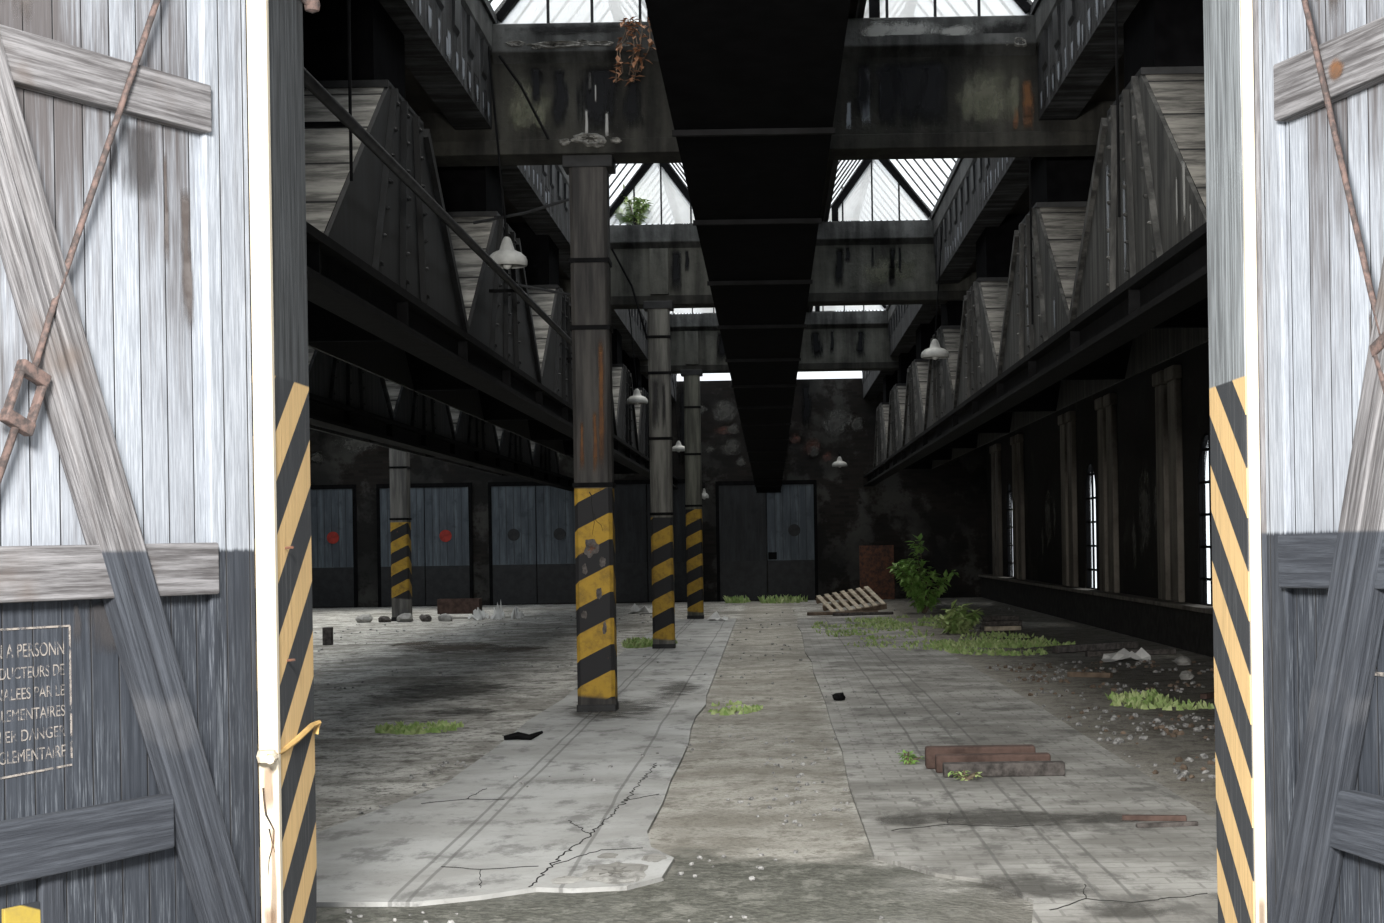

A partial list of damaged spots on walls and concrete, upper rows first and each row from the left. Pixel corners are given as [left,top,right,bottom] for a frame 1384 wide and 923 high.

rust [1330,61,1342,79]
crack [441,763,659,888]